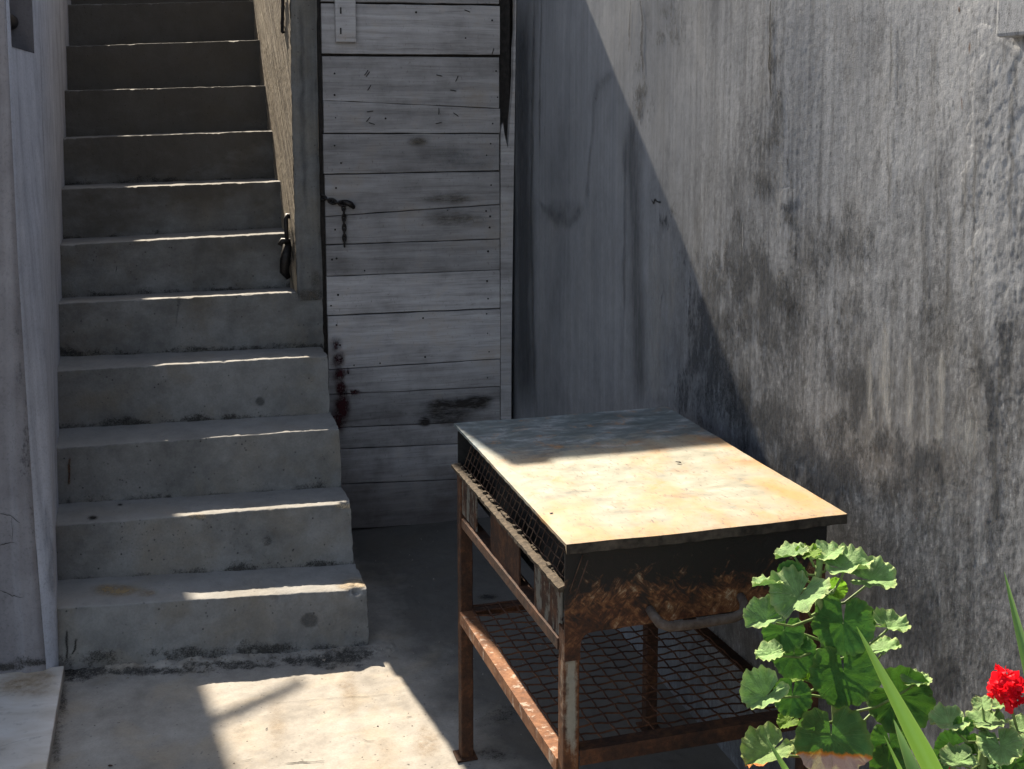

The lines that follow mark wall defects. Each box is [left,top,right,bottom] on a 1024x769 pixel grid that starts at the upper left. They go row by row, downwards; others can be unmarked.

damp [756,6,783,160]
damp [677,207,950,526]
damp [996,318,1012,374]